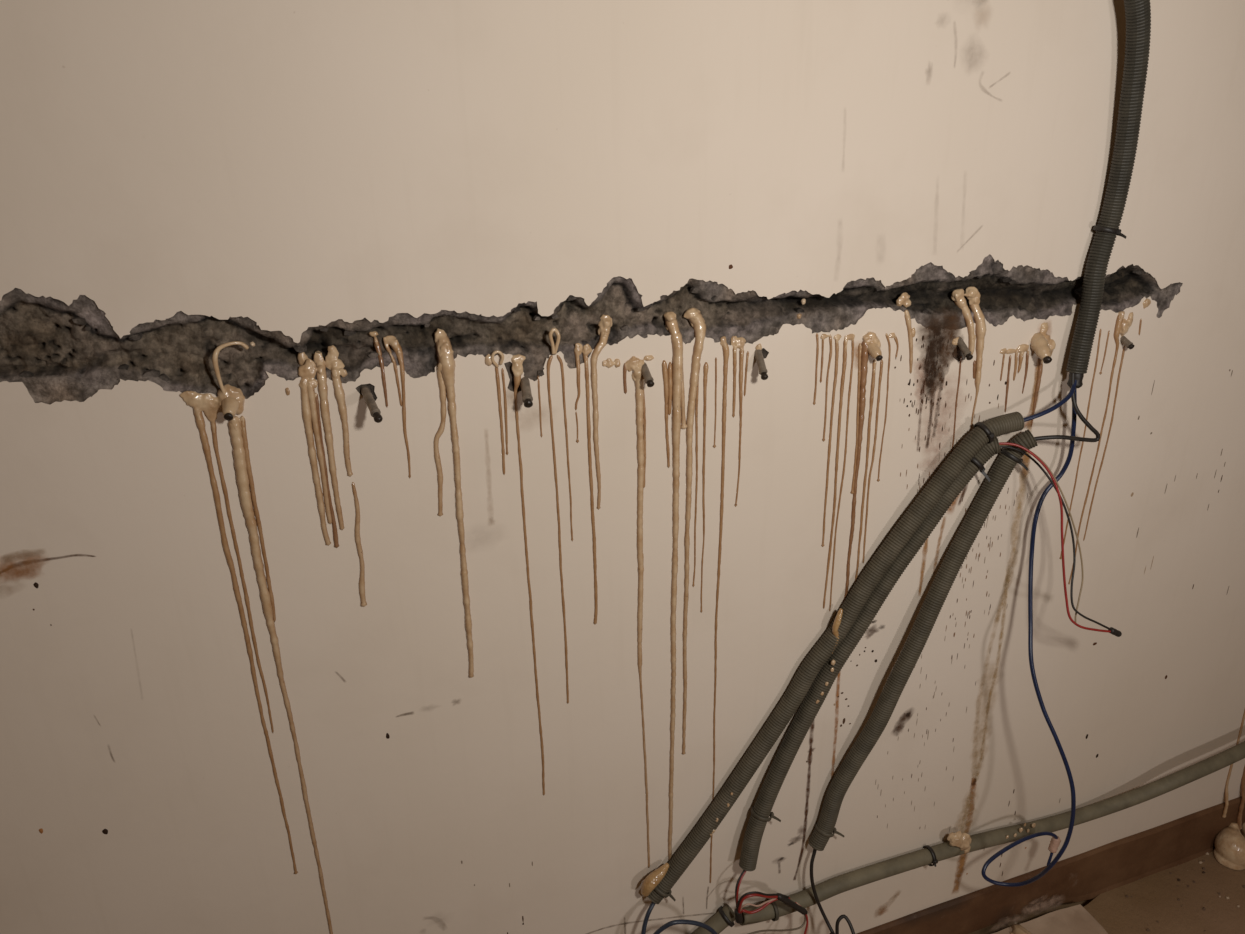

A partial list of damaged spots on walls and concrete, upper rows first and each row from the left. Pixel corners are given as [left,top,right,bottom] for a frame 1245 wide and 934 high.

spalling [0,254,1085,405]
leakage [1000,322,1056,429]
spalling [1100,264,1183,318]
leakage [813,286,986,611]
leakage [962,774,978,833]
leakage [953,853,967,891]